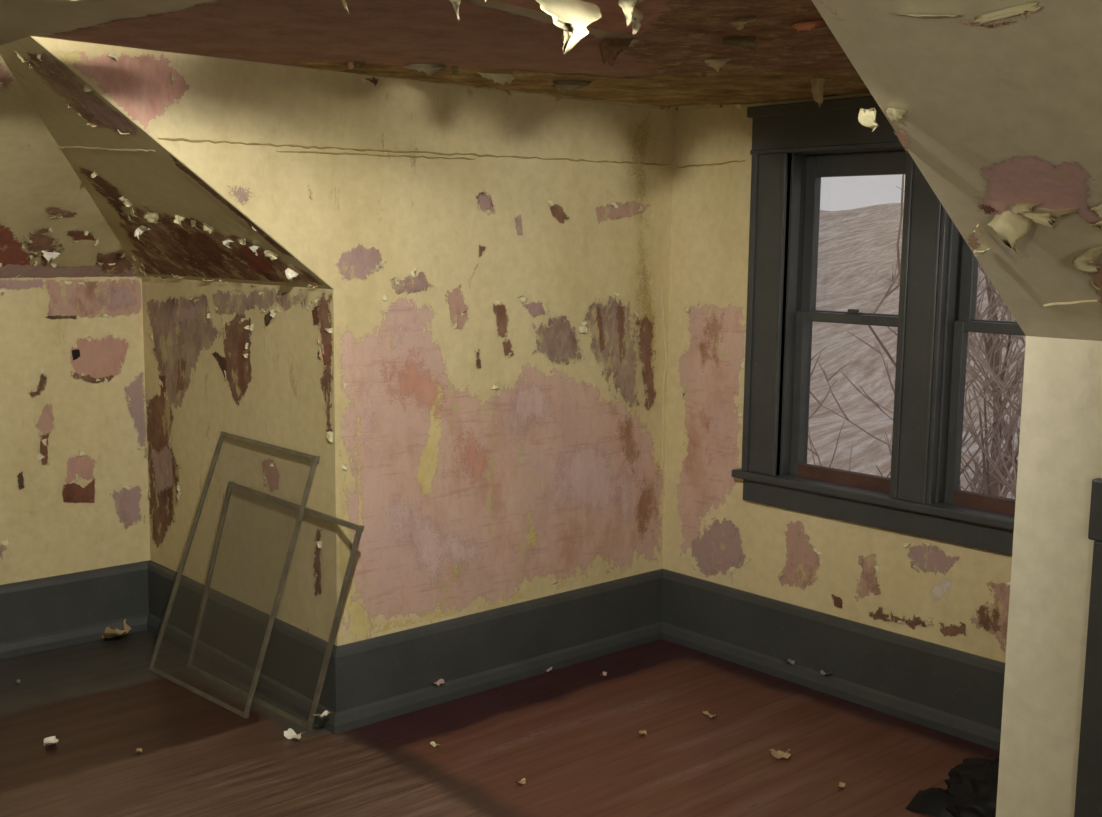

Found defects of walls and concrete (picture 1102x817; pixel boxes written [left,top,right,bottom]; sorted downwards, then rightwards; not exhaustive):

peeling [14,0,870,137]
peeling [858,108,910,153]
peeling [968,156,1102,257]
peeling [1072,246,1102,305]
peeling [0,156,751,637]
peeling [778,520,822,590]
peeling [831,554,1011,652]
peeling [903,542,962,601]